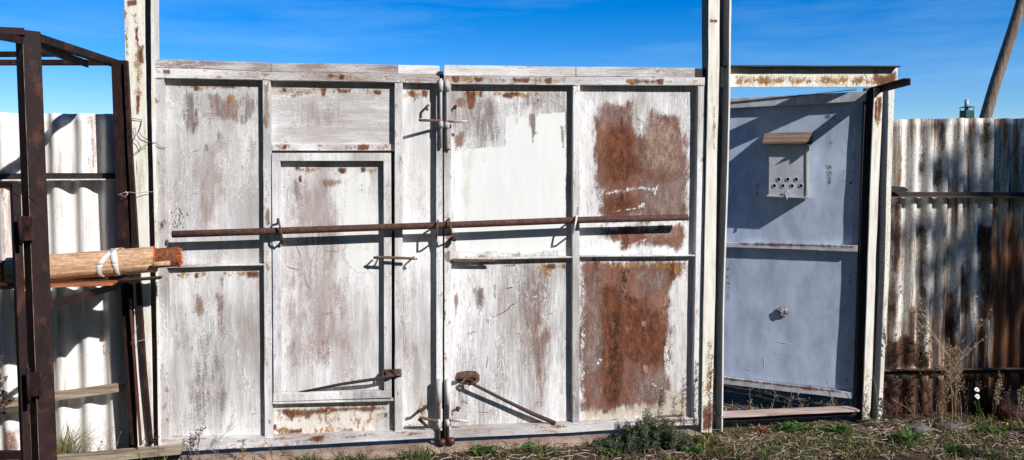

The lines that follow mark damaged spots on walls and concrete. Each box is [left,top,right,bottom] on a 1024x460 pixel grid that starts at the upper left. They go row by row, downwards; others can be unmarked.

corrosion [124,0,144,114]
corrosion [735,72,897,126]
corrosion [864,202,993,419]